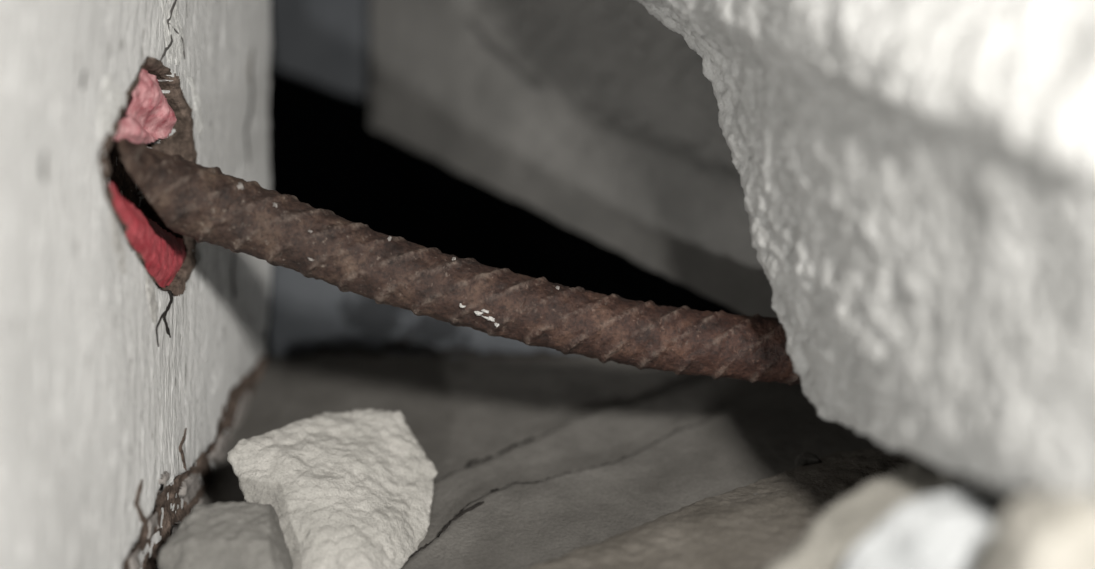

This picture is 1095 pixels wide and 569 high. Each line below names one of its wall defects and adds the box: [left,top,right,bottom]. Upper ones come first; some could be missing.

crack [160,0,185,61]
spalling [97,0,801,386]